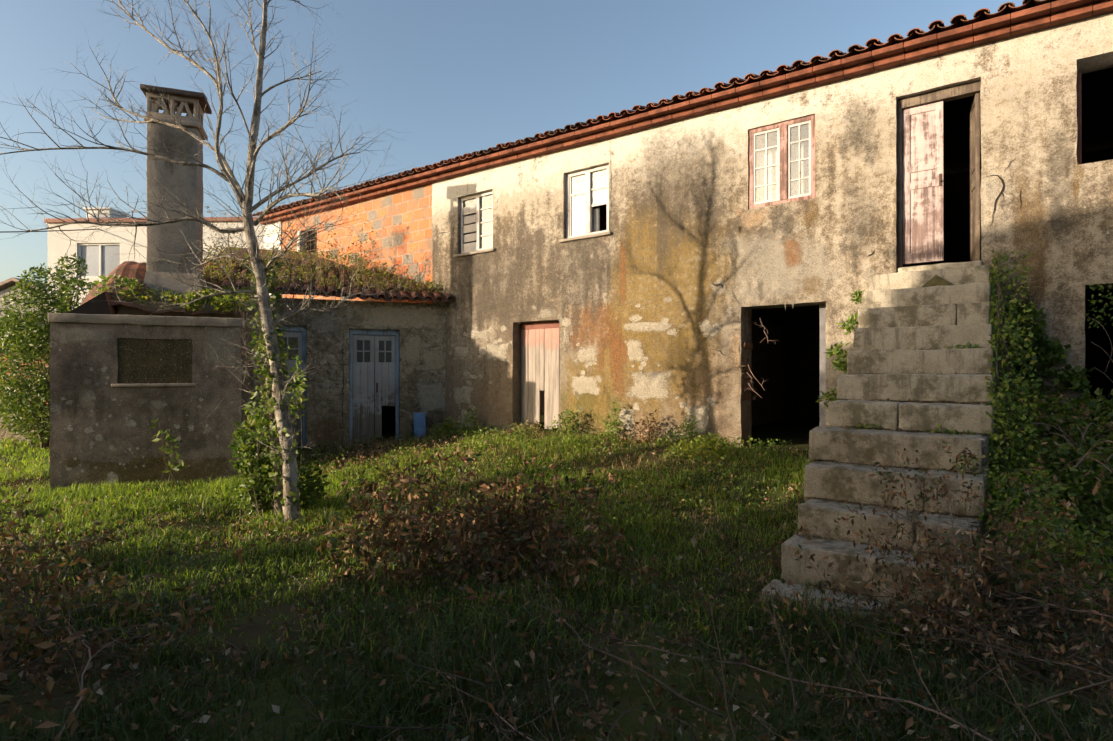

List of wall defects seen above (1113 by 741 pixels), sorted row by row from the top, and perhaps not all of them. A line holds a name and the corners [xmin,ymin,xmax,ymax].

damp [634,141,723,264]
crack [987,159,1021,226]
damp [566,357,609,435]
spalling [618,304,720,441]